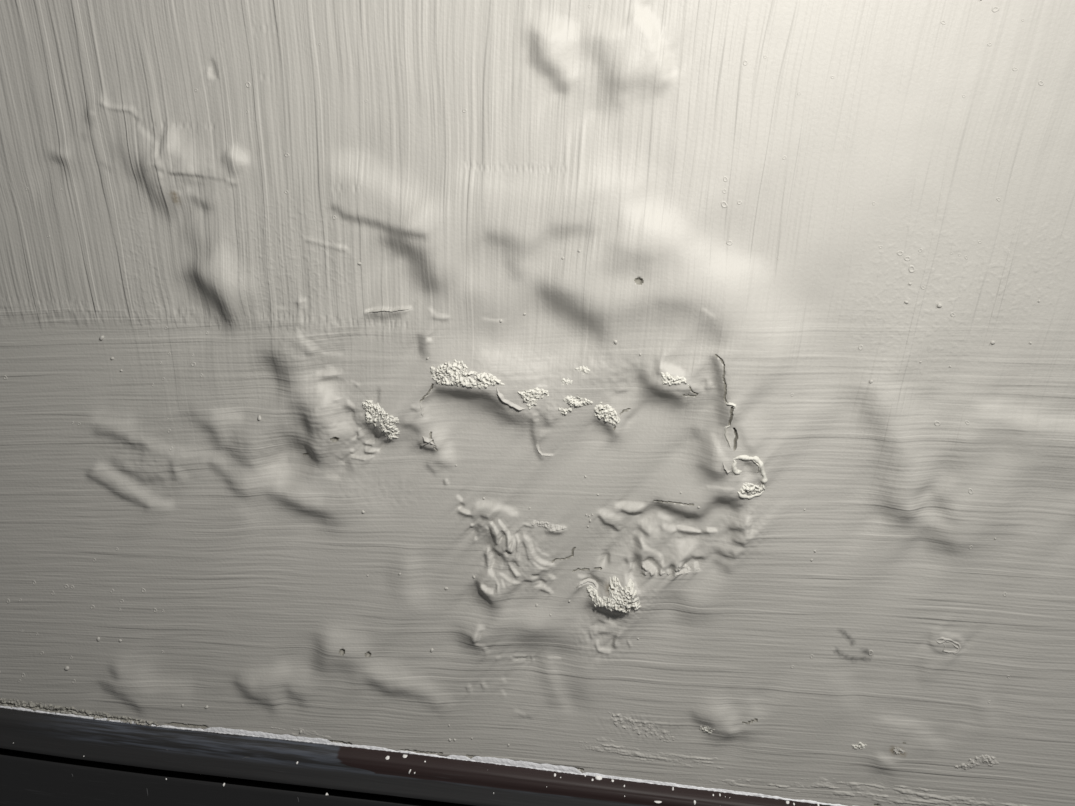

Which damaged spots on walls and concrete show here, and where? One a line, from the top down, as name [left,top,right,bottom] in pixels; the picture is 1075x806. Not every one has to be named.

peeling [362,400,400,440]
peeling [430,359,549,411]
peeling [558,366,620,425]
peeling [661,372,690,387]
crack [683,354,738,451]
spalling [723,425,768,499]
spalling [573,576,642,668]